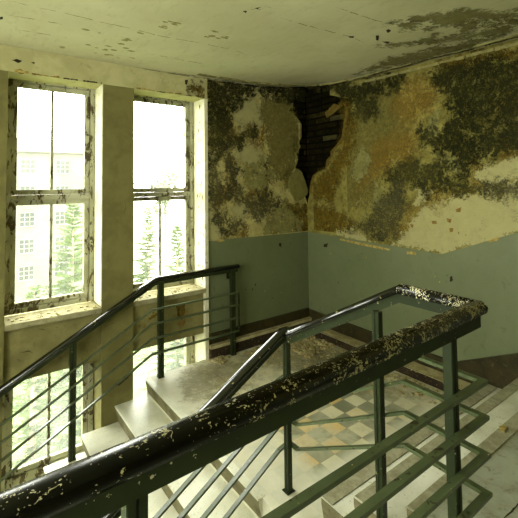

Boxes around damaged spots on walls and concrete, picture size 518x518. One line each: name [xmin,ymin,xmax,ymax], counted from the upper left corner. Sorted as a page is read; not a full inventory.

peeling [198,207,227,245]
spalling [197,34,518,235]
leakage [314,7,518,124]
leakage [357,51,518,242]